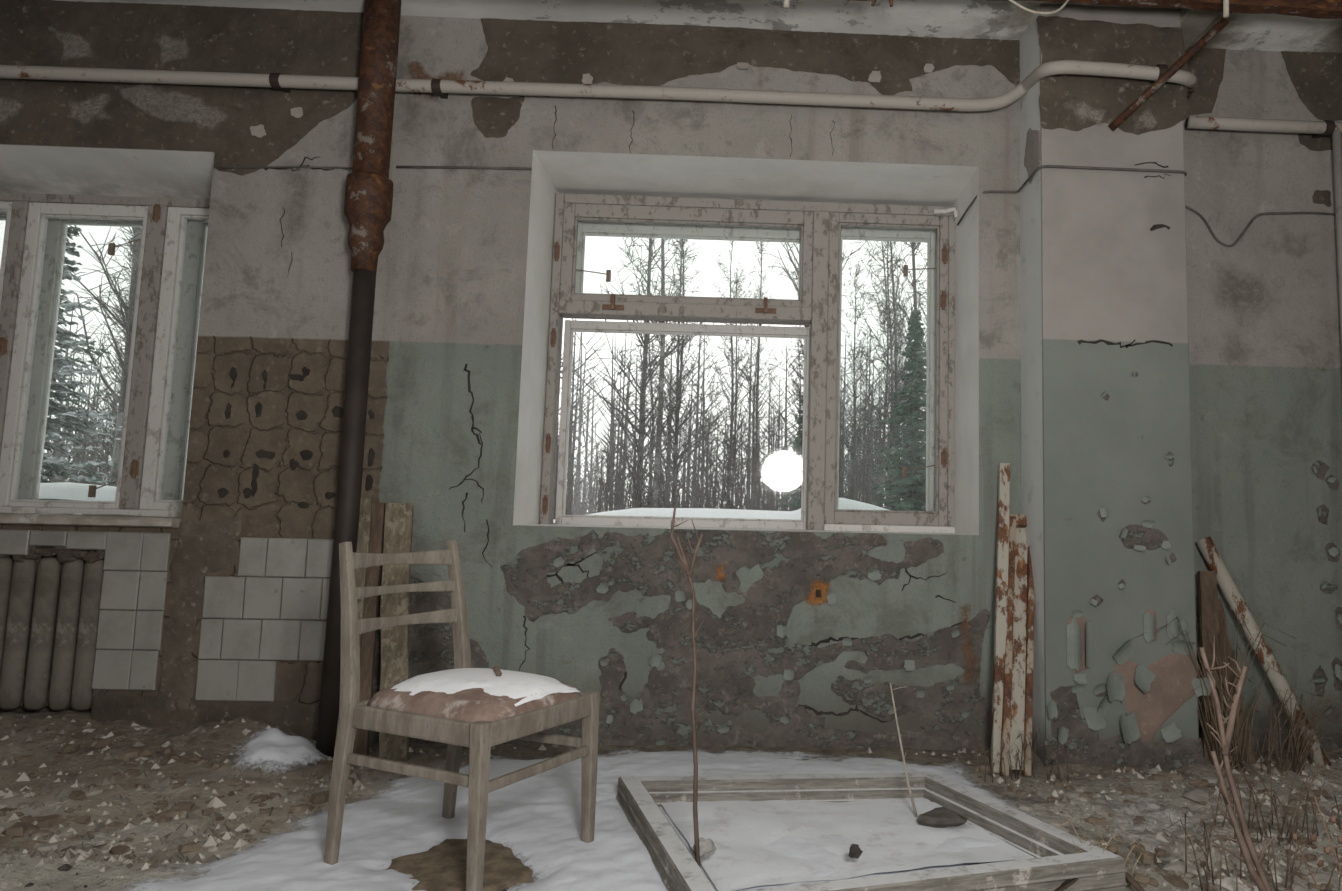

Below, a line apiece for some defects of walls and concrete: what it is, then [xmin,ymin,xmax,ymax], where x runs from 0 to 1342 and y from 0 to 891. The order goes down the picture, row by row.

spalling [0,0,364,176]
spalling [470,18,1020,138]
spalling [1024,16,1226,184]
spalling [224,367,237,419]
spalling [217,449,313,500]
spalling [288,367,310,381]
crack [448,364,492,567]
spalling [91,516,319,740]
peeling [500,529,990,750]
peeling [1045,610,1212,770]
peeling [1310,657,1342,732]